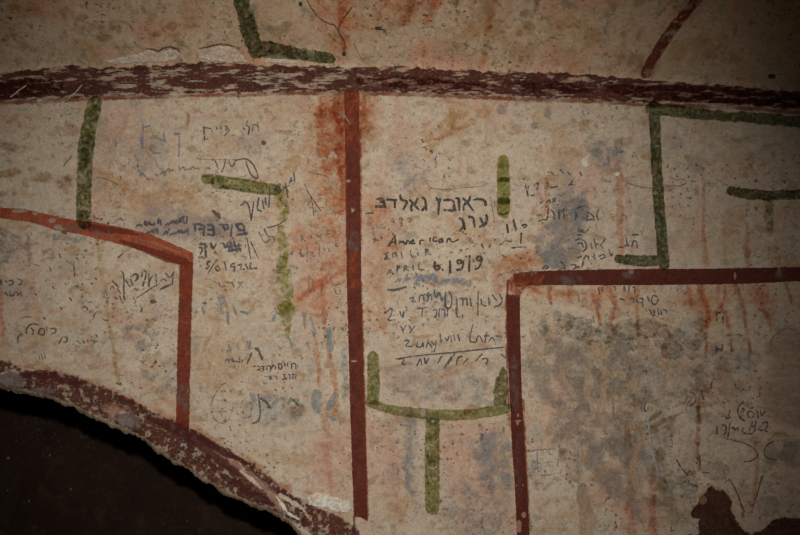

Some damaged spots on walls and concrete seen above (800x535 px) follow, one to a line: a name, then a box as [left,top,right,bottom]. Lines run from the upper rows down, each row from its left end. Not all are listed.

peeling [307,492,352,513]